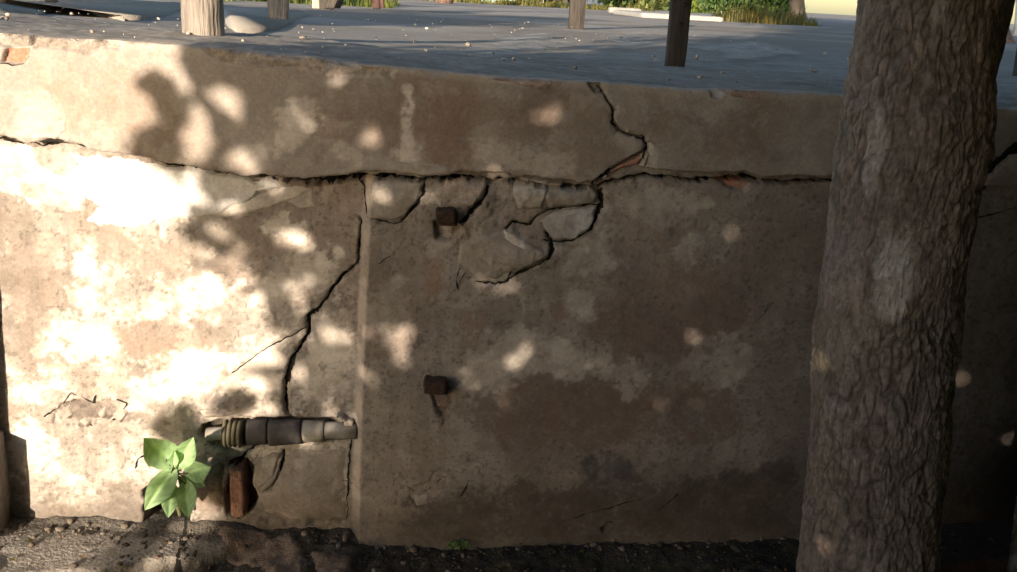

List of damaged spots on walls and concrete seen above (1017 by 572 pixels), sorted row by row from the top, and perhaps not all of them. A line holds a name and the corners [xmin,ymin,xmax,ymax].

corrosion [1,44,209,169]
crack [0,136,86,147]
flaking render [0,119,315,228]
crack [138,155,230,173]
flaking render [368,162,487,220]
flaking render [513,178,597,240]
crack [449,86,832,296]
crack [983,142,1017,189]
flaking render [437,223,548,279]
crack [232,172,515,412]
spalling [45,394,128,428]